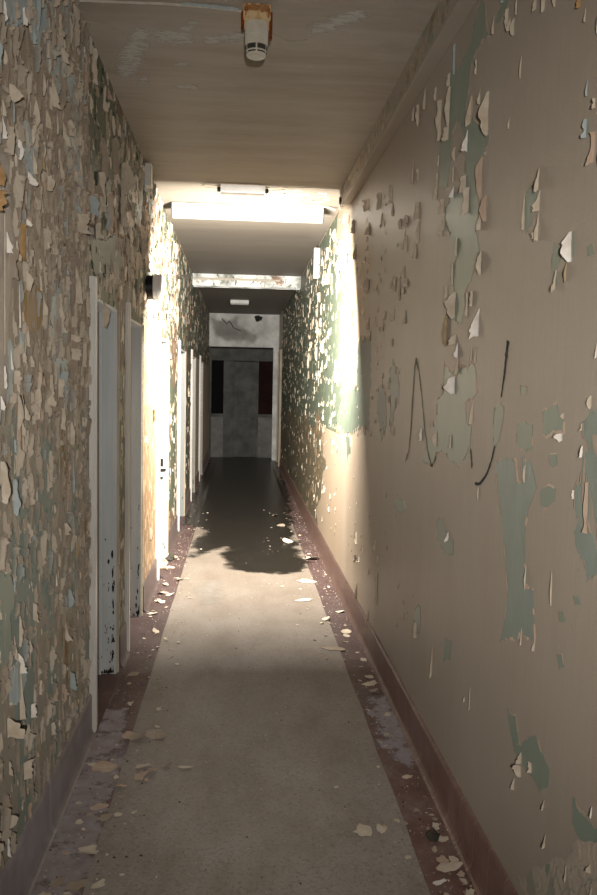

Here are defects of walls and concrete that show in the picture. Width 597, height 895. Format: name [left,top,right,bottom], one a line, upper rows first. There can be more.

peeling [532,0,556,13]
peeling [341,0,455,204]
peeling [580,80,596,165]
peeling [411,0,518,468]
peeling [521,168,541,241]
peeling [551,231,574,291]
peeling [213,185,420,535]
peeling [0,0,209,875]
peeling [542,401,565,467]
leakage [182,457,310,574]
peeling [496,455,556,652]
peeling [507,708,550,811]